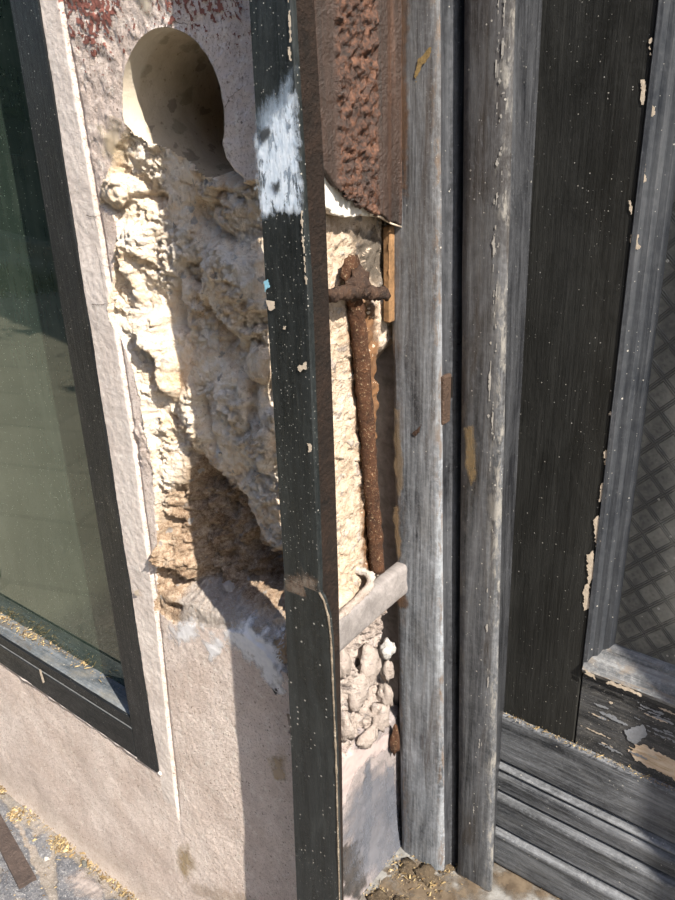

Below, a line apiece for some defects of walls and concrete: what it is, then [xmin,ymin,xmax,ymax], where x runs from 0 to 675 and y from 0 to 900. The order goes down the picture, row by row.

peeling [58,0,135,75]
peeling [140,0,251,54]
flaking render [99,127,286,647]
rust [363,300,379,439]
rust [394,410,403,496]
rust [360,482,370,569]
rust [393,507,402,557]
peeling [583,516,601,610]
efflorescence [169,617,286,695]
spalling [319,592,396,900]
peeling [587,681,675,780]